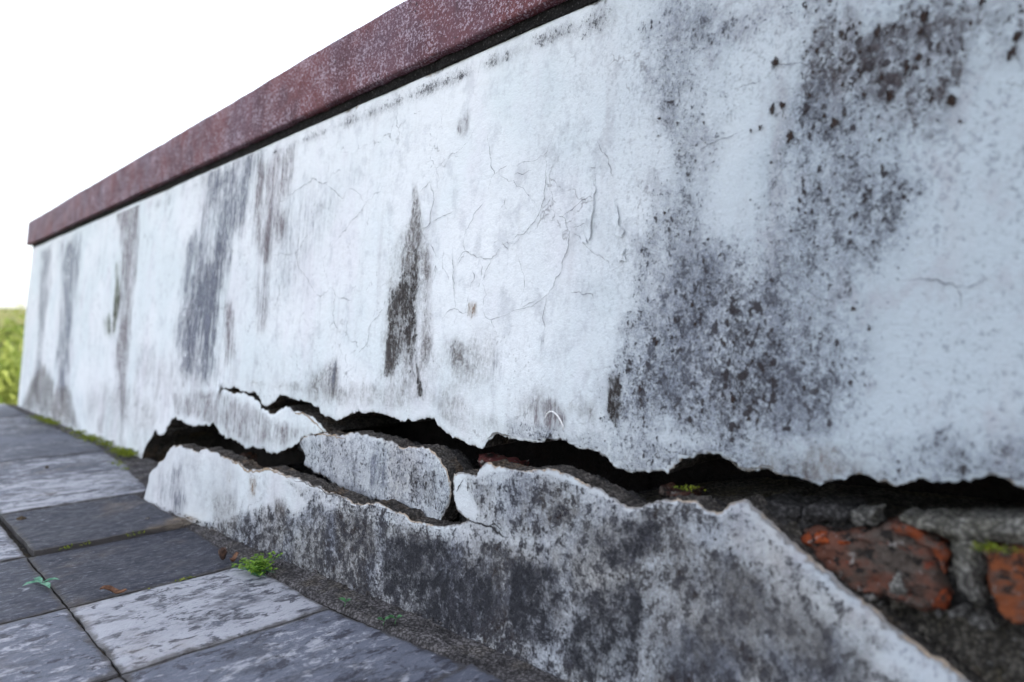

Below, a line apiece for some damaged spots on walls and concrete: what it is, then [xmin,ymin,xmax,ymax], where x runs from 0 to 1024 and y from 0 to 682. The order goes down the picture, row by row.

leakage [346,67,467,123]
leakage [23,236,80,427]
leakage [107,205,138,425]
crack [212,411,385,502]
crack [421,137,613,327]
leakage [174,130,903,682]
spalling [639,489,666,503]
crack [381,420,1024,538]
leakage [507,0,1024,482]
spalling [679,477,1024,682]
crack [948,541,1024,624]